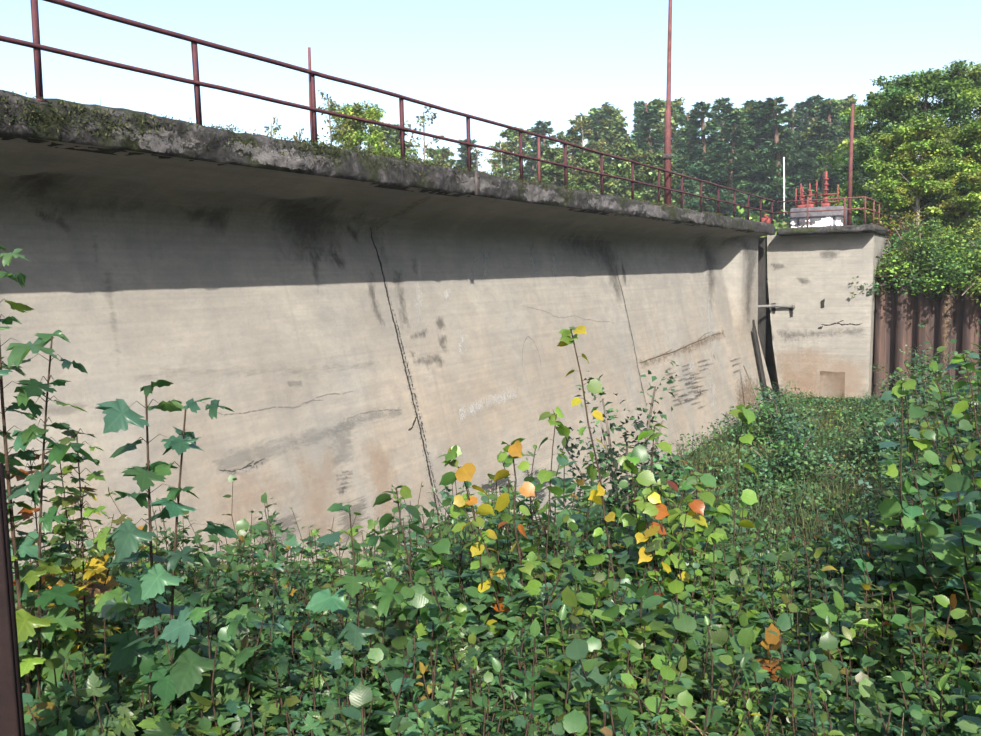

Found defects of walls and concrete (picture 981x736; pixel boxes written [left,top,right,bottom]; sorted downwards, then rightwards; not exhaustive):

crack [217,228,444,520]
crack [521,266,720,406]
crack [821,319,862,327]